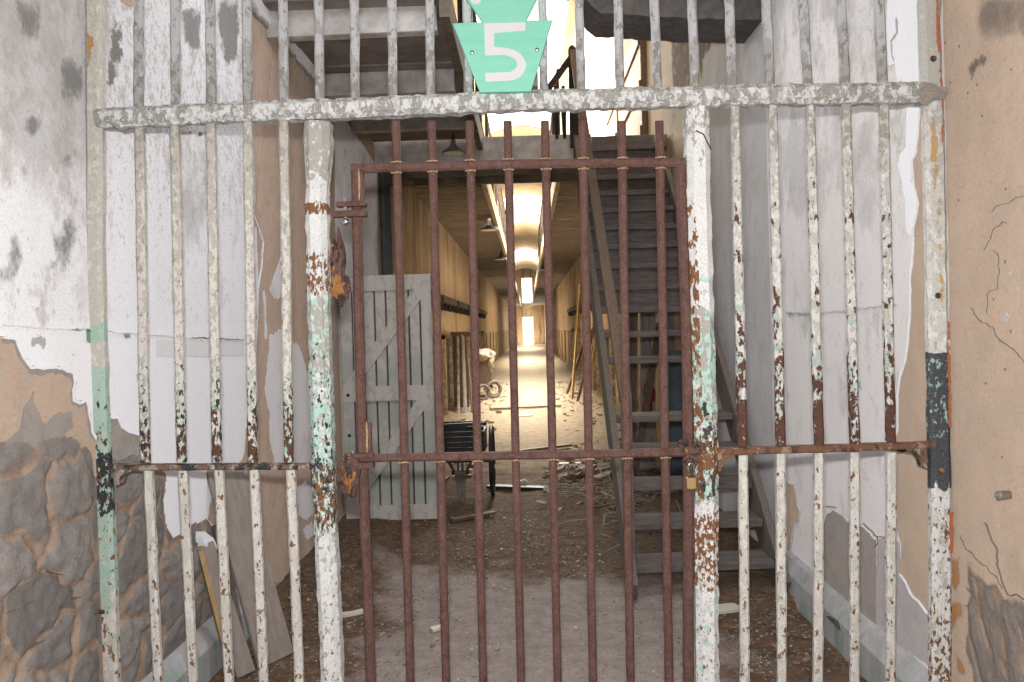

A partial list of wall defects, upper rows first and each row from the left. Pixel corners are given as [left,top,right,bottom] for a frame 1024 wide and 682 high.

leakage [62,64,82,94]
flaking render [266,42,315,101]
leakage [55,223,72,254]
flaking render [240,122,315,583]
flaking render [331,280,346,522]
crack [970,195,1024,363]
flaking render [0,336,104,682]
flaking render [111,417,217,682]
flaking render [953,522,1024,682]